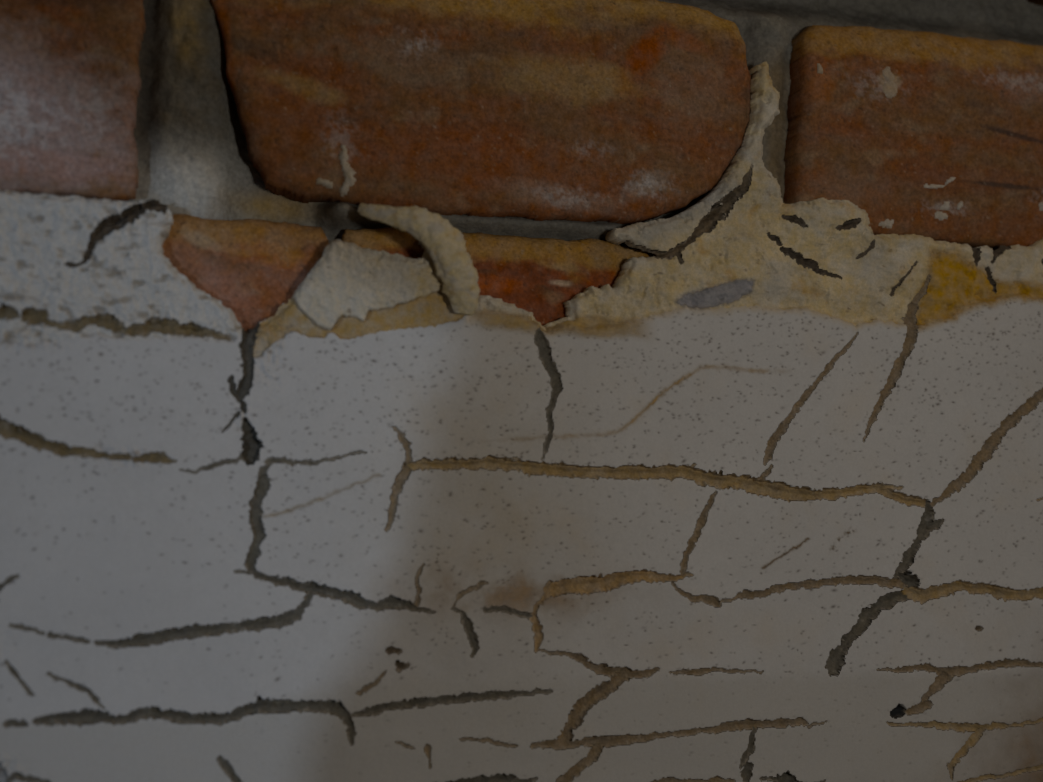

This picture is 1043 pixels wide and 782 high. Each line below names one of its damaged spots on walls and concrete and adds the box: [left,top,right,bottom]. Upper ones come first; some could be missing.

crack [63,199,168,268]
flaking render [0,190,243,346]
flaking render [253,62,1043,358]
crack [767,214,875,280]
crack [972,245,1012,294]
crack [863,261,932,442]
crack [0,303,1043,782]